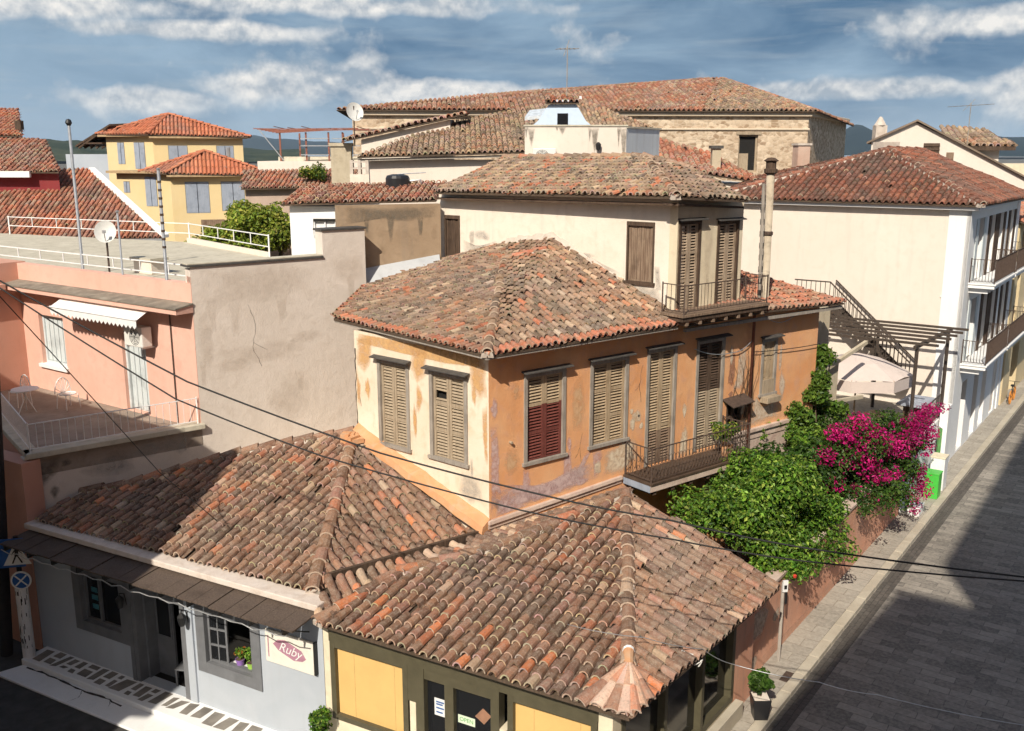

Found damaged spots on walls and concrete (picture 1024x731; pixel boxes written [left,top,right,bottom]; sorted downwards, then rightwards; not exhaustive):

peeling [483,401,643,513]